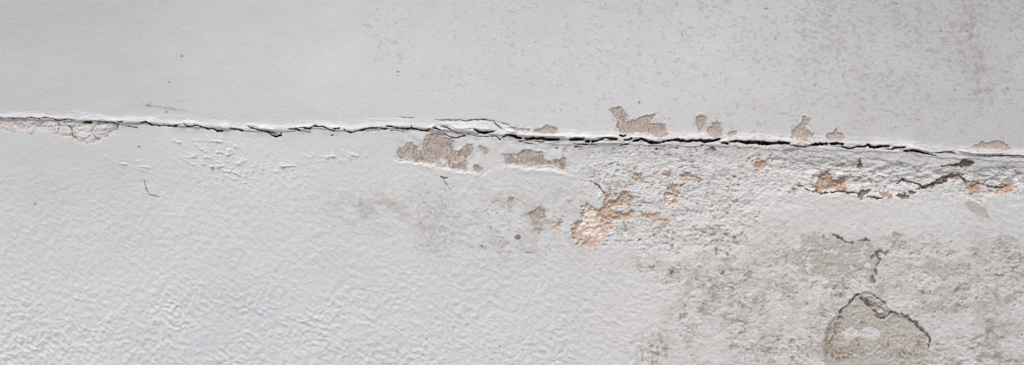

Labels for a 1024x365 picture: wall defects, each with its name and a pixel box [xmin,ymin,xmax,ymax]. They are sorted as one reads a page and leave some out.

spalling [0,116,138,144]
peeling [397,119,566,174]
crack [12,117,1024,200]
spalling [528,164,716,249]
peeling [609,106,669,138]
peeling [695,115,737,151]
peeling [790,116,845,142]
spalling [812,141,1013,220]
peeling [794,232,931,365]